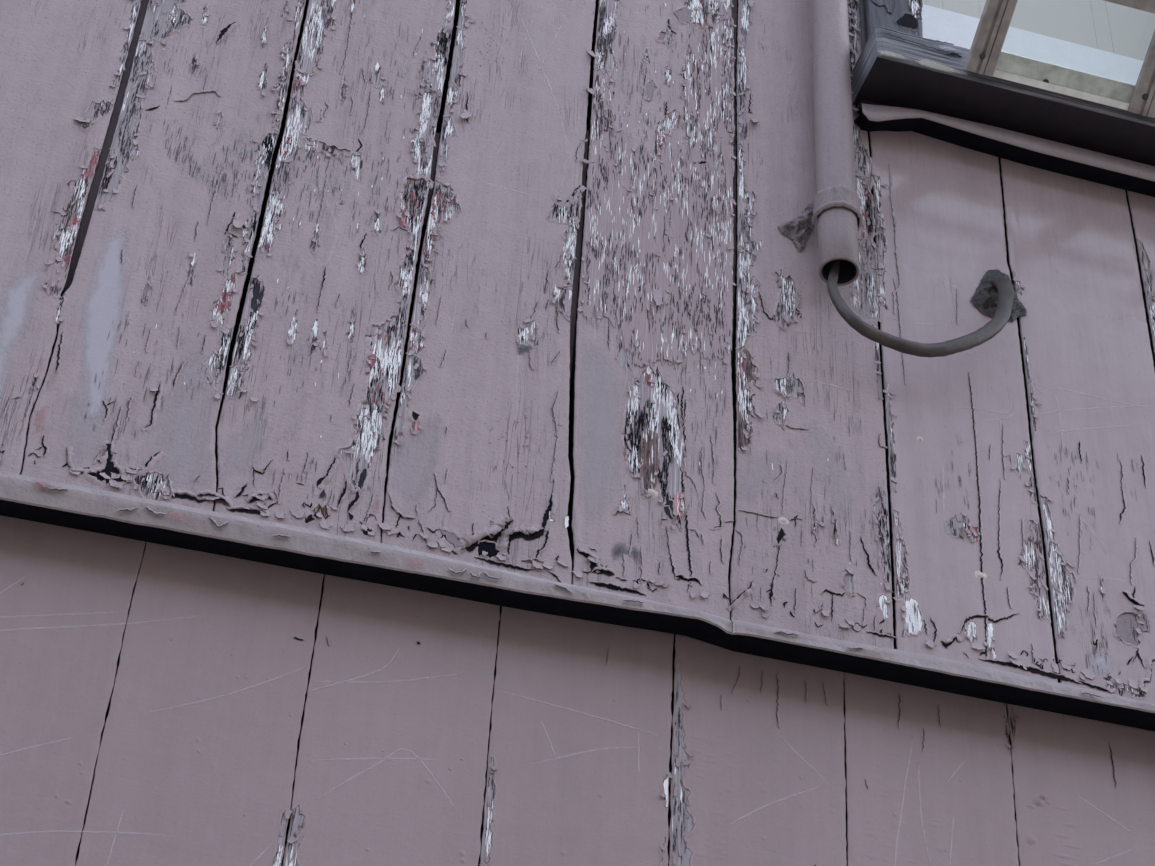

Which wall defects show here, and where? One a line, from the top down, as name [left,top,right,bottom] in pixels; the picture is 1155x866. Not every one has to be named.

peeling [202,0,364,402]
crack [130,0,443,319]
peeling [332,0,476,500]
crack [466,22,508,123]
crack [2,260,1155,698]
crack [551,0,753,209]
peeling [546,0,807,533]
peeling [811,102,948,648]
crack [877,164,907,385]
crack [871,0,963,57]
peeling [1011,337,1080,639]
peeling [269,804,308,866]